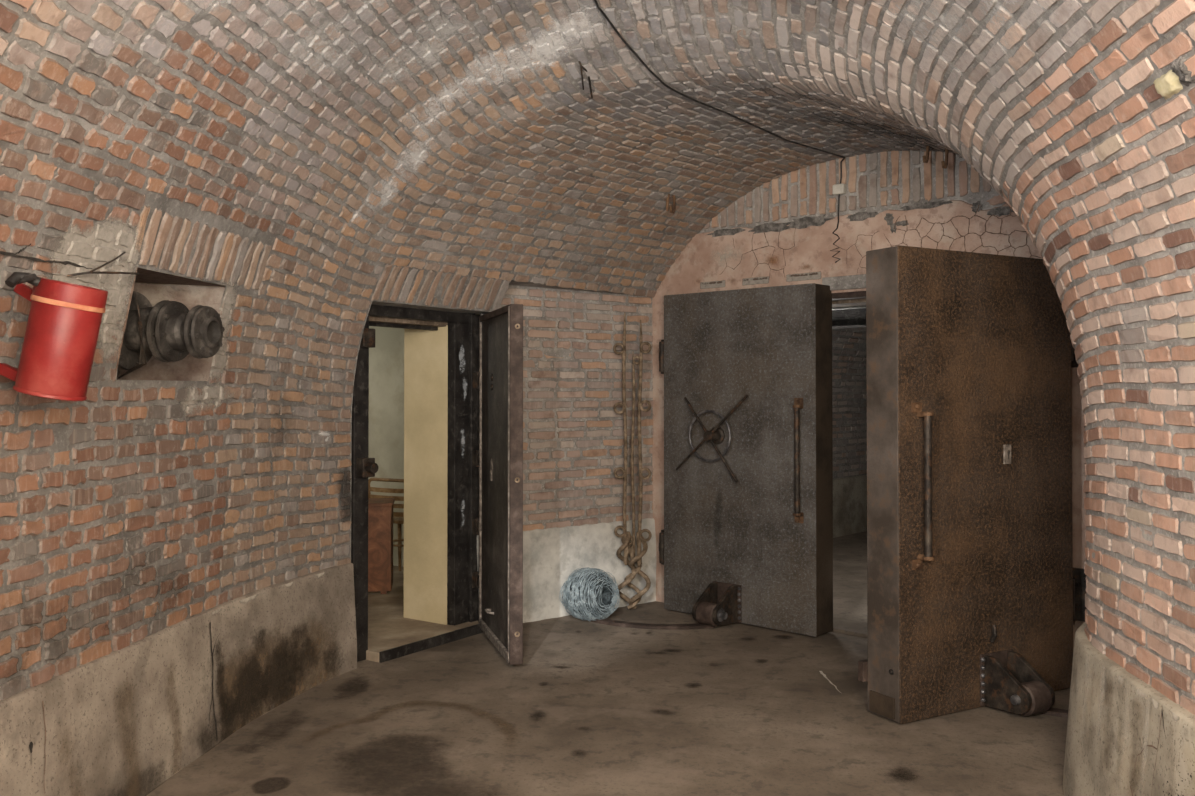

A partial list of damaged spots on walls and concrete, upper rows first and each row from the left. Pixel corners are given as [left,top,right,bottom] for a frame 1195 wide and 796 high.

damp [201,625,367,752]
damp [253,778,289,794]
damp [339,737,466,796]
crack [1130,706,1165,796]